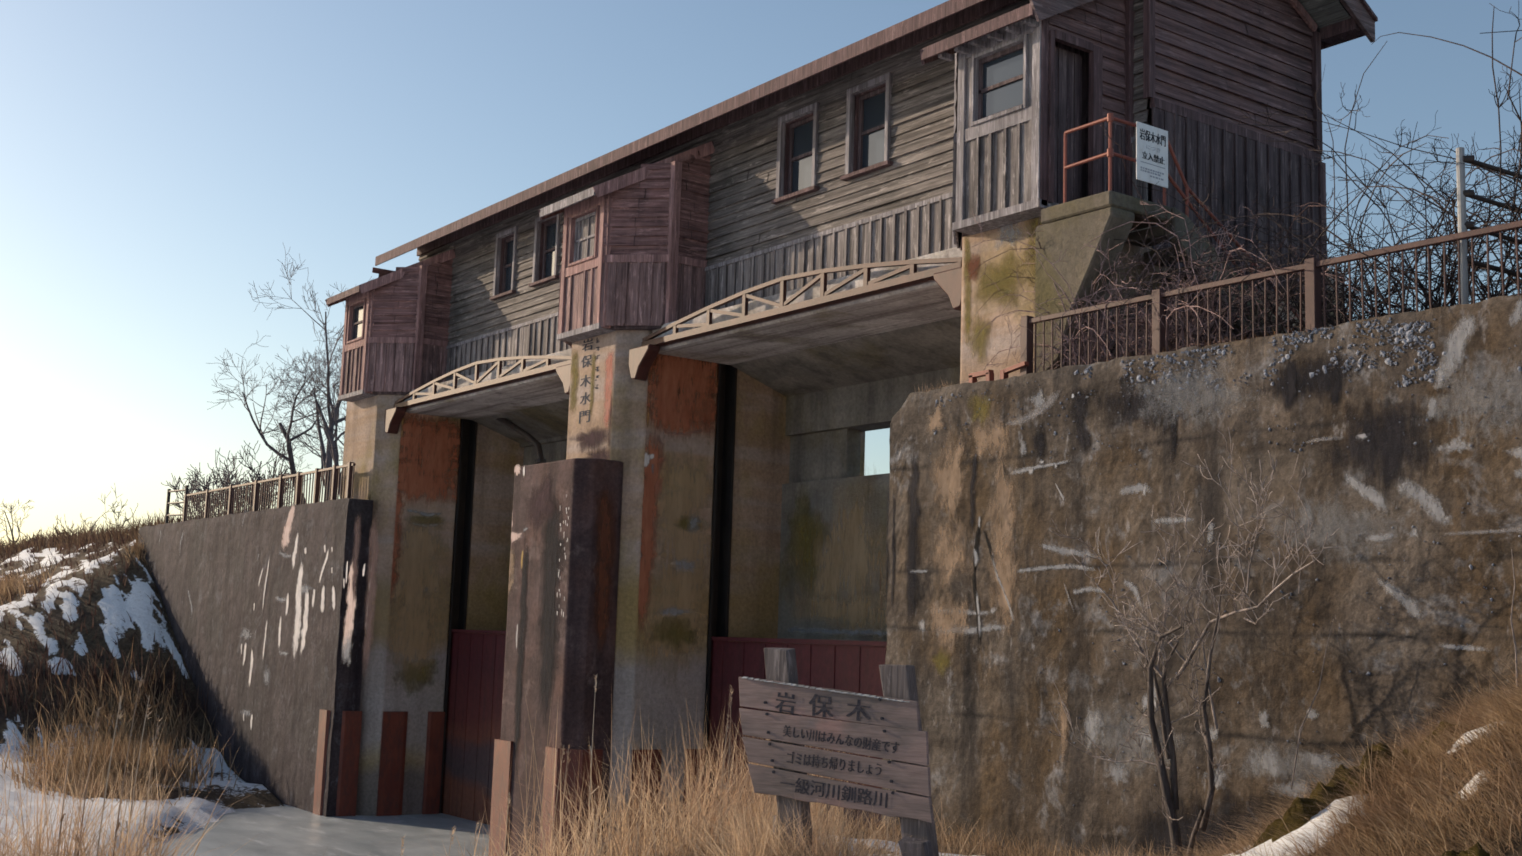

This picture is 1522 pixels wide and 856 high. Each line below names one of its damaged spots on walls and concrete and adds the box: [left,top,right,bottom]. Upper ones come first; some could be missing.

damp [964,216,1043,359]
corrosion [397,415,460,501]
corrosion [638,354,718,660]
damp [1010,373,1197,501]
damp [1268,319,1522,534]